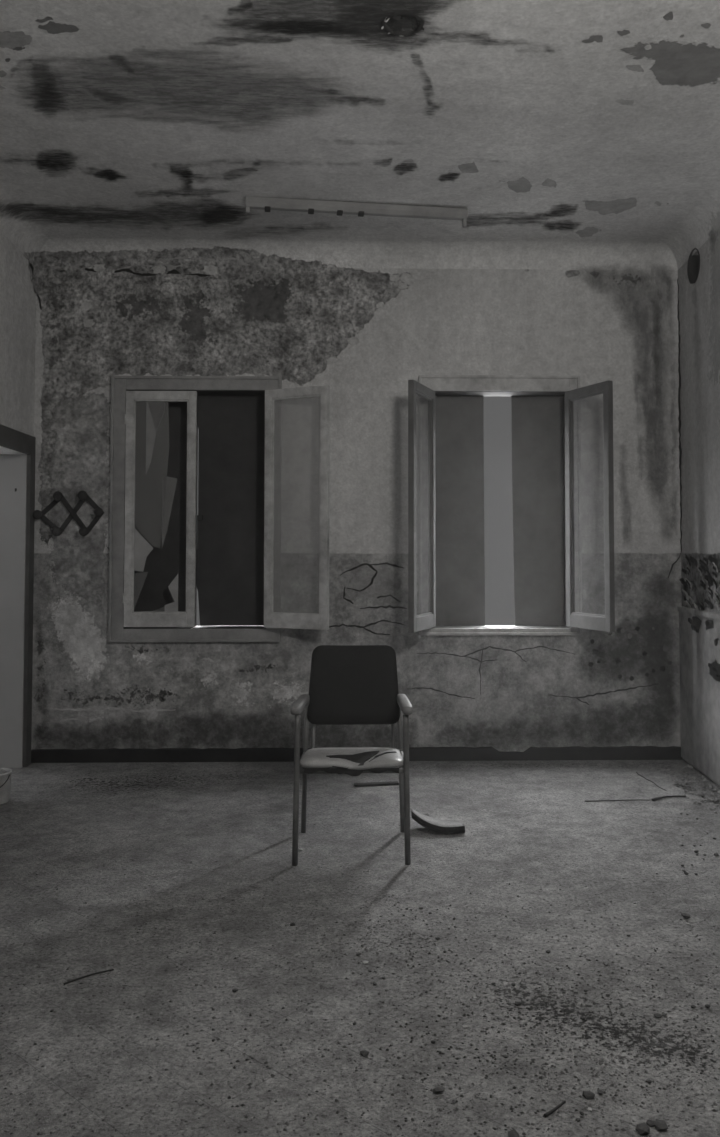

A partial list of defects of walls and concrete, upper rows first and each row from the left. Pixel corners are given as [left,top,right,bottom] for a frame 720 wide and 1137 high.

peeling [0,17,79,89]
water stain [208,0,426,45]
peeling [618,23,720,87]
water stain [21,52,382,127]
water stain [9,153,74,173]
water stain [0,162,258,230]
peeling [24,246,435,723]
crack [329,620,404,635]
peeling [679,553,720,646]
crack [412,646,574,699]
crack [552,684,658,705]
peeling [708,660,720,682]